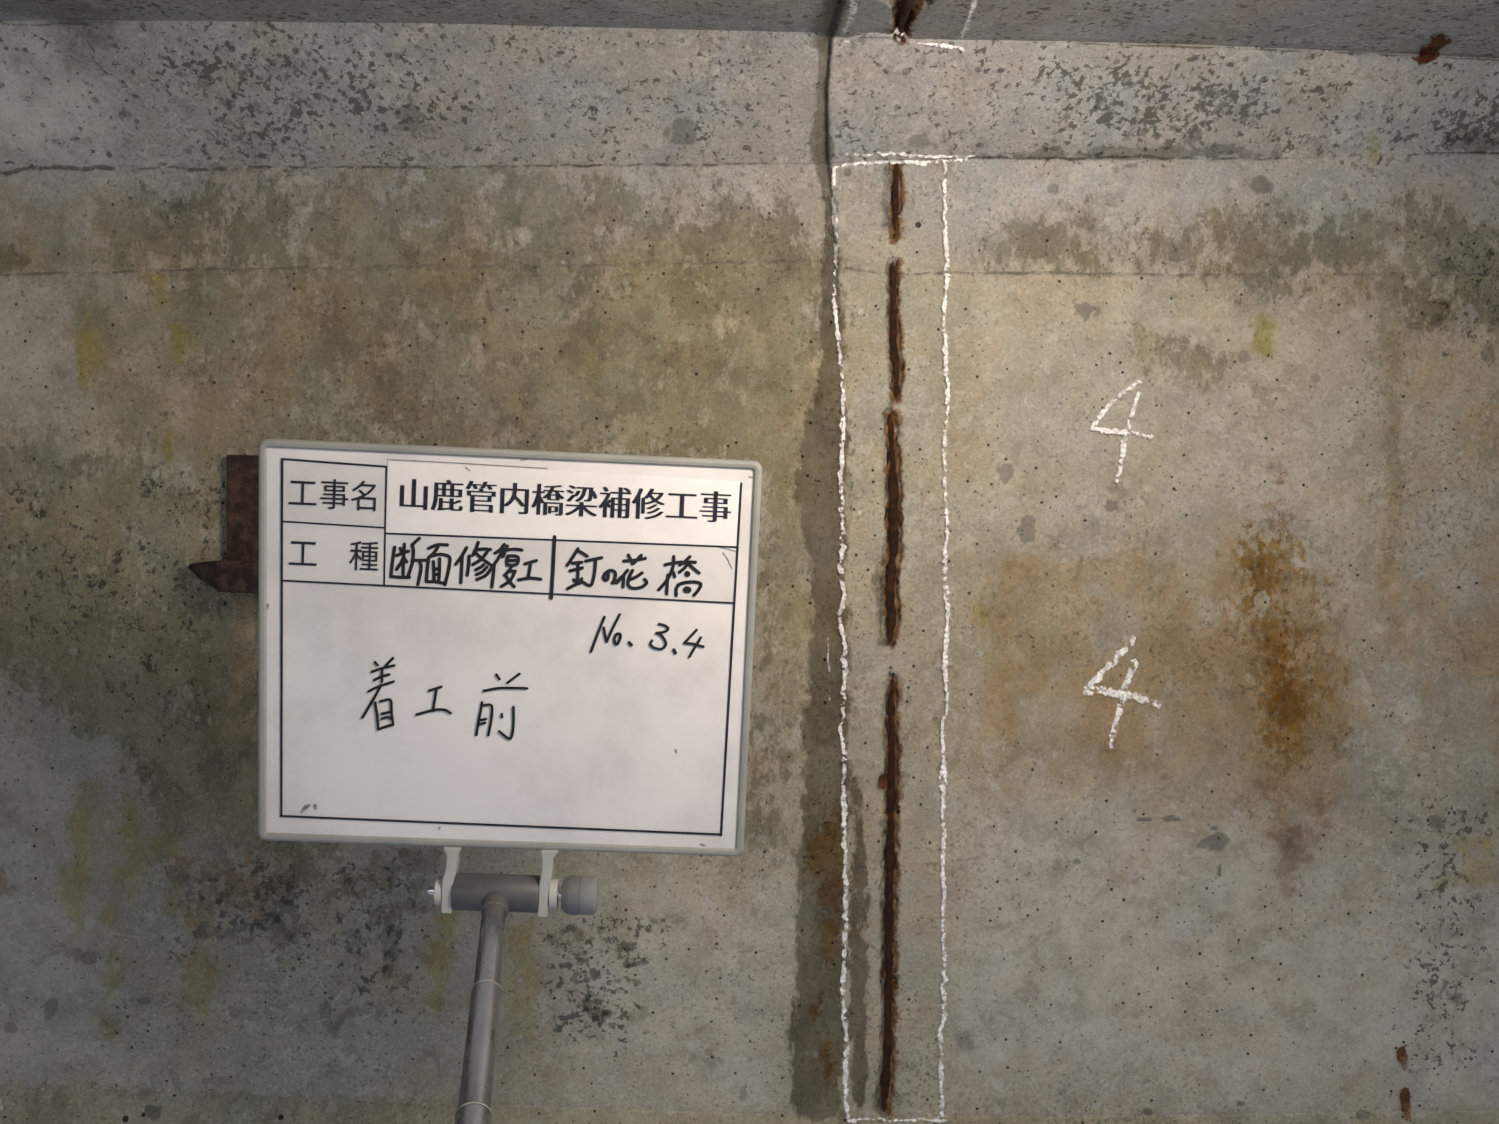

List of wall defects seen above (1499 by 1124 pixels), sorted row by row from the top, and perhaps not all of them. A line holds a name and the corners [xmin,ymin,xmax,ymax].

spalling [889,0,937,45]
rust [1411,34,1451,67]
crack [3,163,757,175]
water stain [955,189,1499,608]
water stain [0,166,1184,1124]
rust [976,462,1354,897]
rust [1396,1046,1408,1069]
rust [1400,1087,1411,1121]